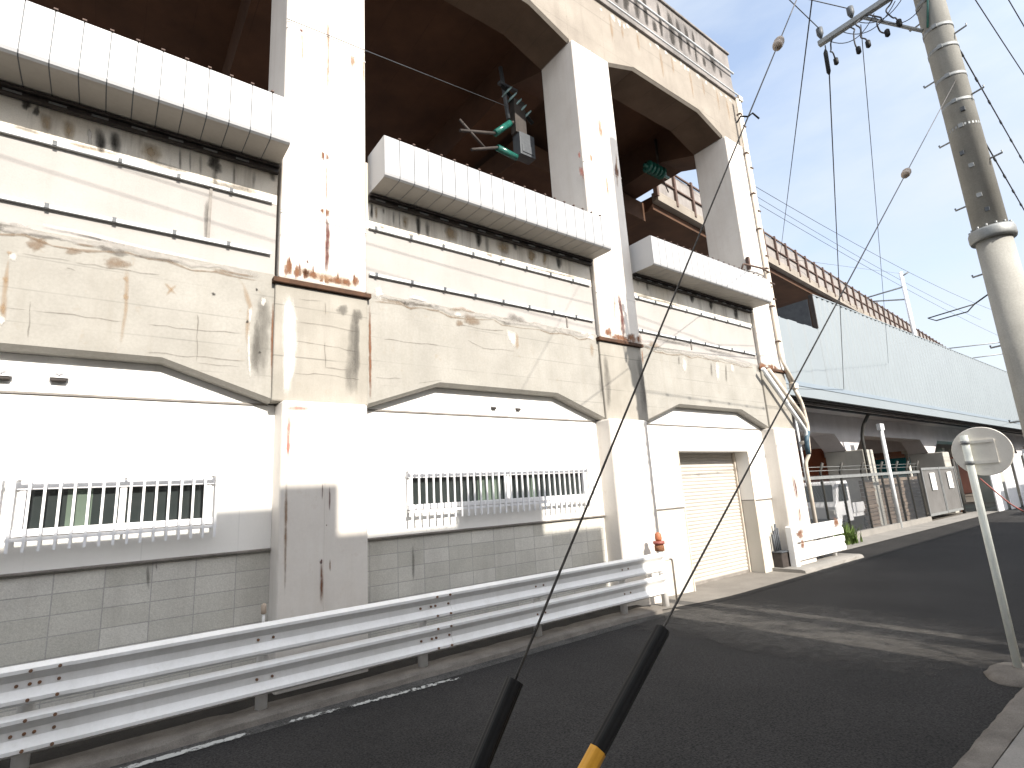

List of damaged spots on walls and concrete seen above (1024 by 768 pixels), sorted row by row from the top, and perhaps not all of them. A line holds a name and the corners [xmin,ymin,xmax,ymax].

rust [285,209,359,285]
damp [246,288,266,371]
damp [340,307,360,376]
rust [606,296,641,344]